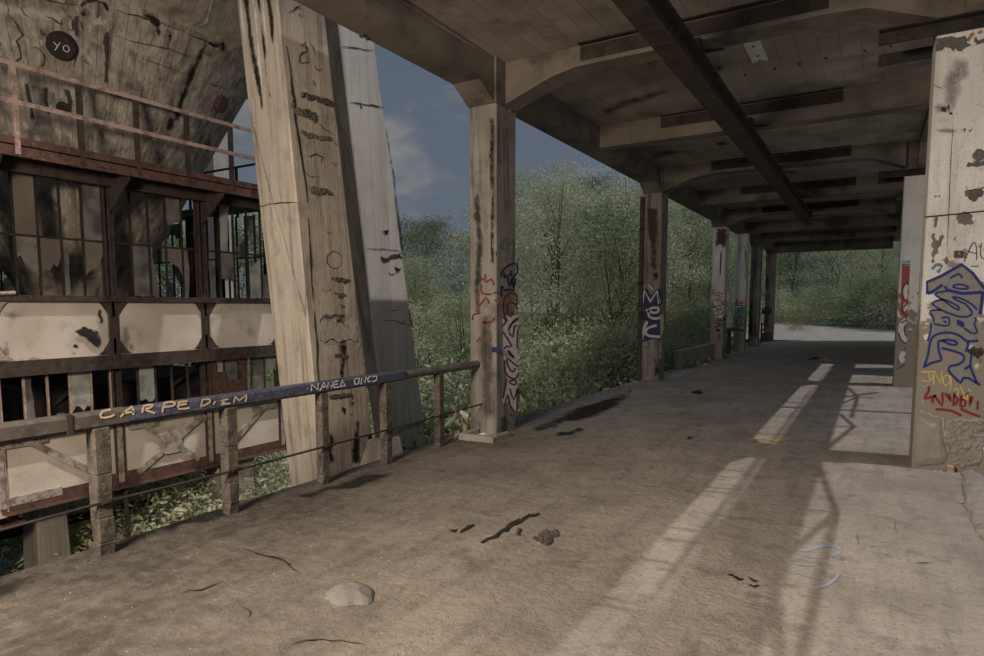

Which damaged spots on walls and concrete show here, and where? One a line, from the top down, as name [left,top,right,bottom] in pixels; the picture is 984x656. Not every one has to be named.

crack [0,0,83,68]
crack [114,9,230,92]
leakage [239,0,273,120]
peeling [935,36,984,51]
spalling [966,149,984,167]
crack [450,513,540,543]